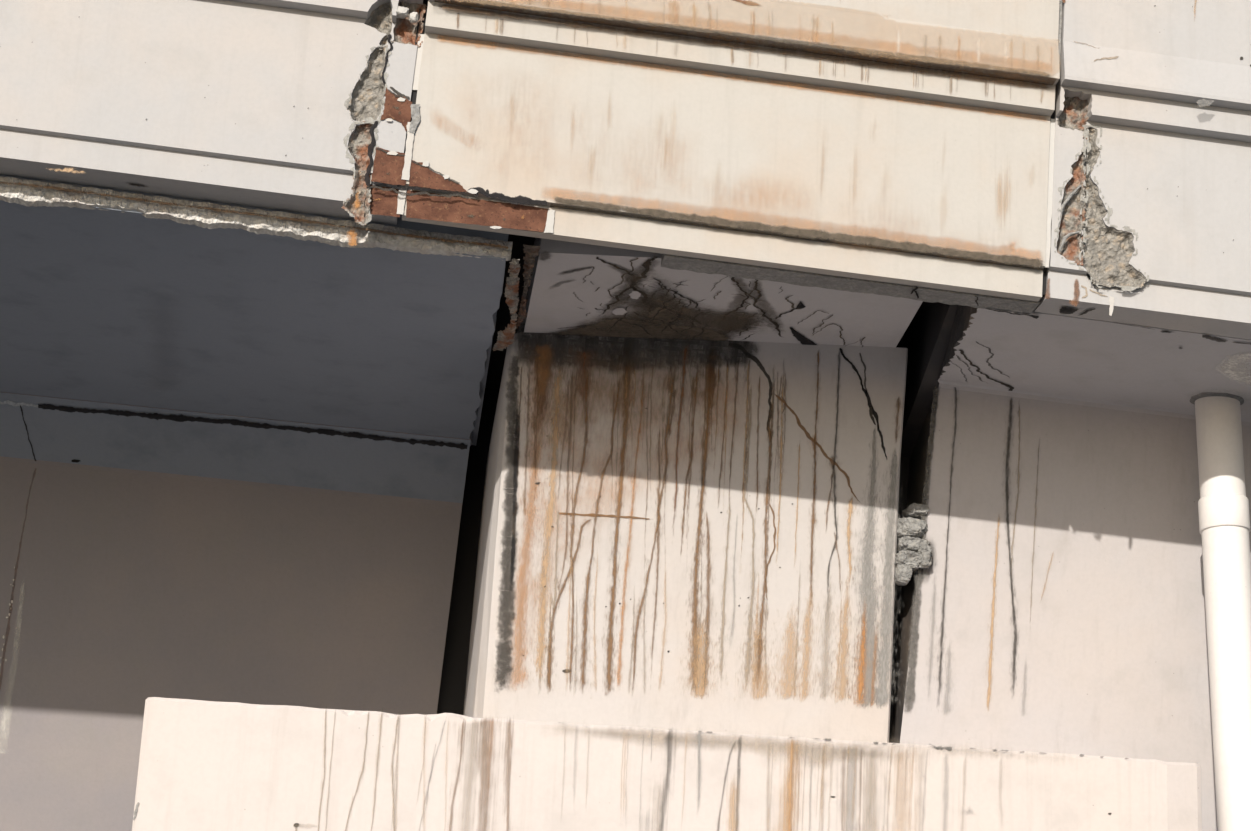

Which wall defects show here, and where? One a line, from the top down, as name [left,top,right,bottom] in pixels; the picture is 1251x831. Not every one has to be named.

spalling [0,2,555,351]
rust [434,0,1057,88]
spalling [1054,124,1149,291]
crack [20,405,36,461]
water stain [345,713,398,831]
rust [515,348,561,680]
water stain [496,262,783,697]
crack [557,256,887,676]
water stain [784,351,900,706]
water stain [905,568,923,711]
water stain [919,387,939,540]
crack [956,342,1020,688]